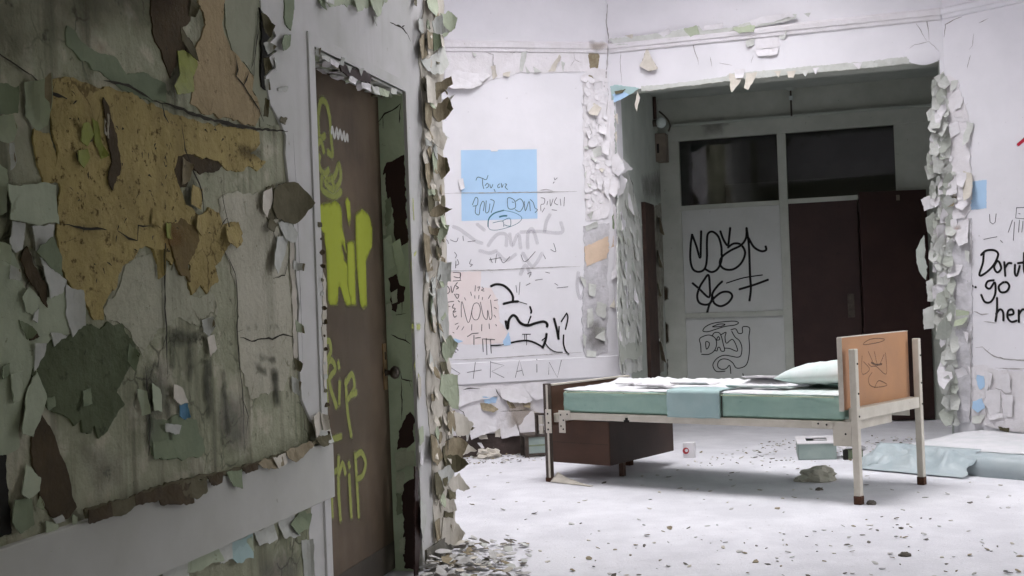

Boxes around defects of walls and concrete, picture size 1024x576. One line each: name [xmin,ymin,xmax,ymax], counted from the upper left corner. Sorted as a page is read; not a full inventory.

flaking render [0,0,334,537]
crack [226,213,303,444]
peeling [318,0,388,26]
spalling [315,47,400,99]
peeling [395,0,909,576]
peeling [916,71,1024,433]